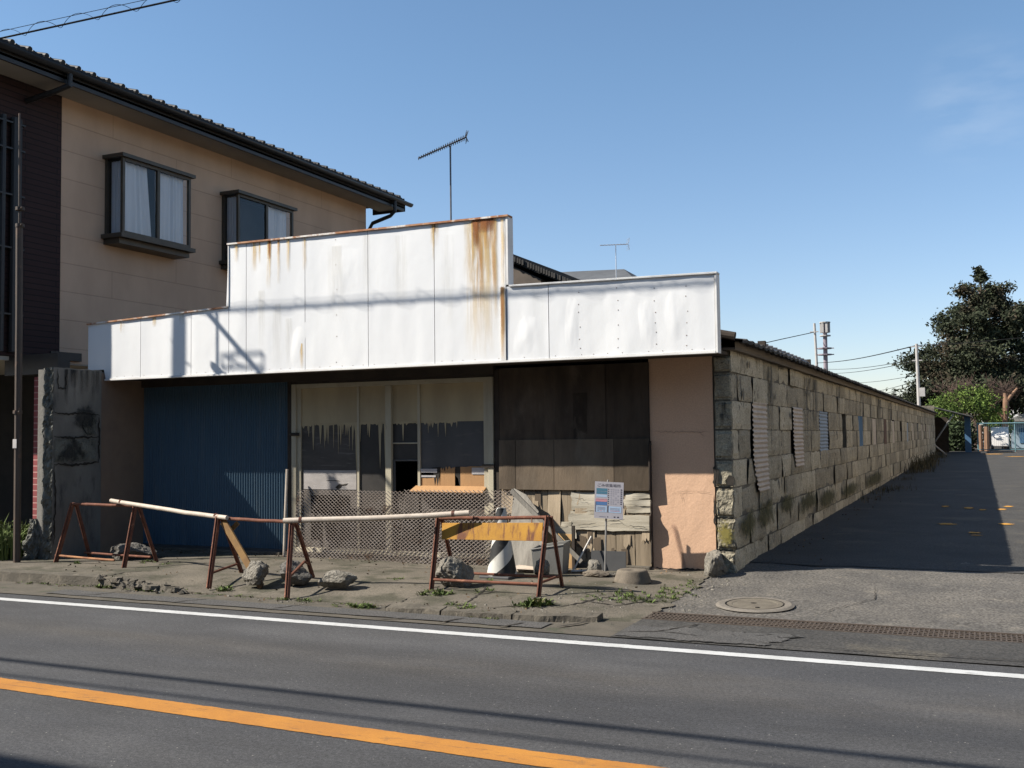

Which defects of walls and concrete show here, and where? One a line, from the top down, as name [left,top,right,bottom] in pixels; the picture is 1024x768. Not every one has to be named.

rust [471,218,503,267]
leakage [76,406,95,429]